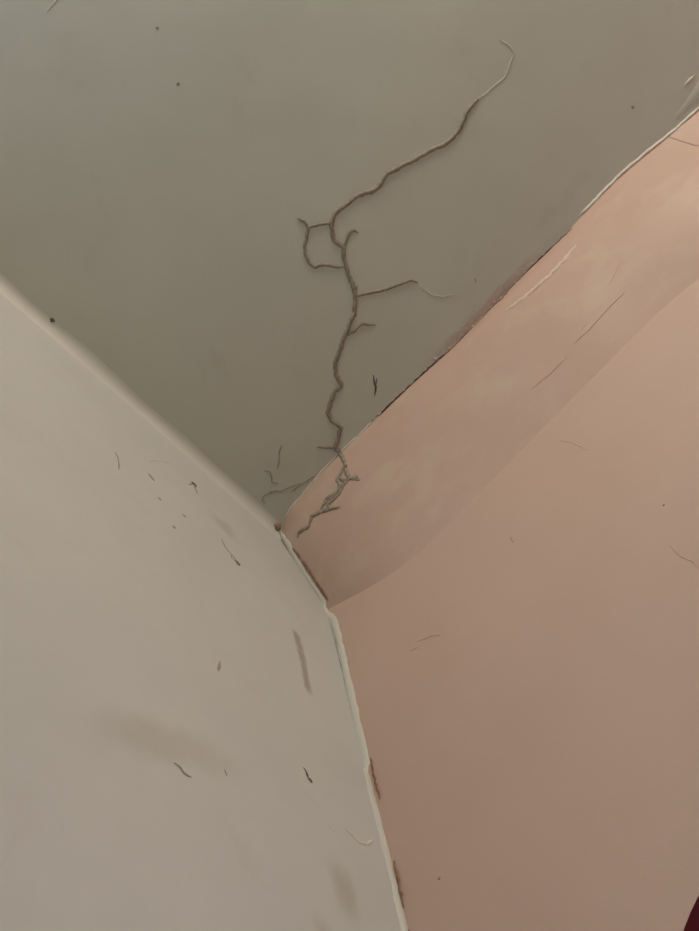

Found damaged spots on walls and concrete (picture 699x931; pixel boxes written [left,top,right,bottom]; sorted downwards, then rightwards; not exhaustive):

crack [262,39,515,601]
crack [371,228,572,422]
crack [370,757,380,799]
crack [393,860,404,908]